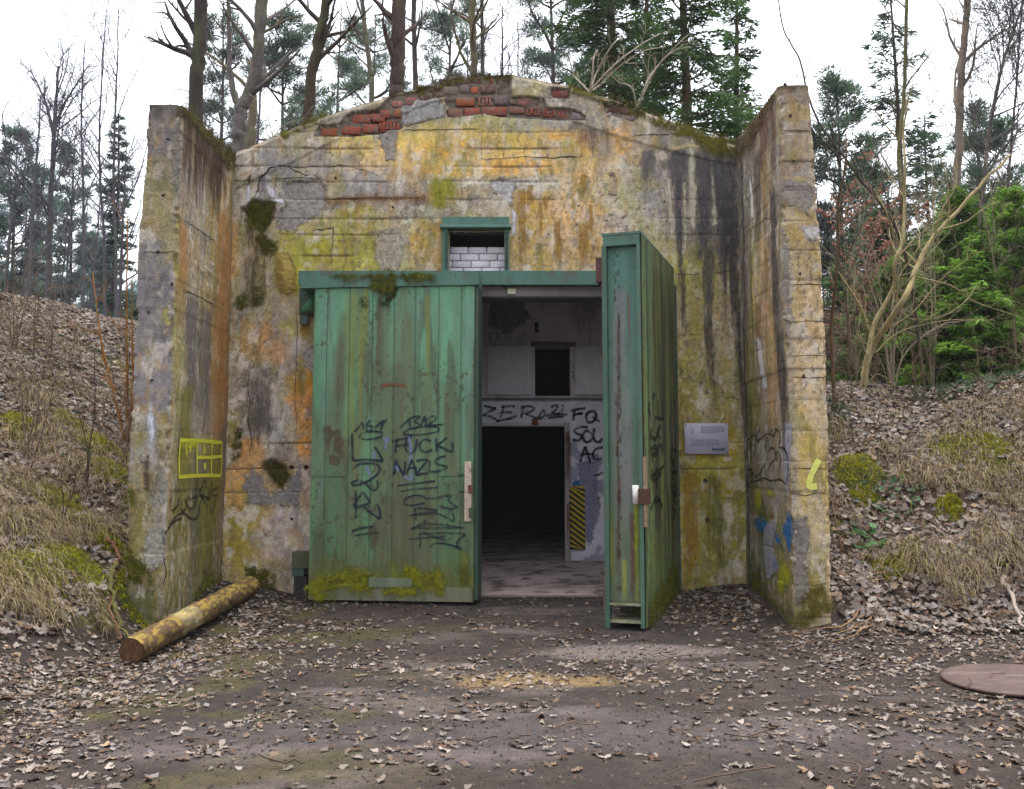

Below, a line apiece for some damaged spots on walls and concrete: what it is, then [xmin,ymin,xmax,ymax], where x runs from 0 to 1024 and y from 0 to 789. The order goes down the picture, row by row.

rust [183,117,231,486]
crack [248,165,378,197]
flaking render [314,73,589,161]
water stain [643,144,792,592]